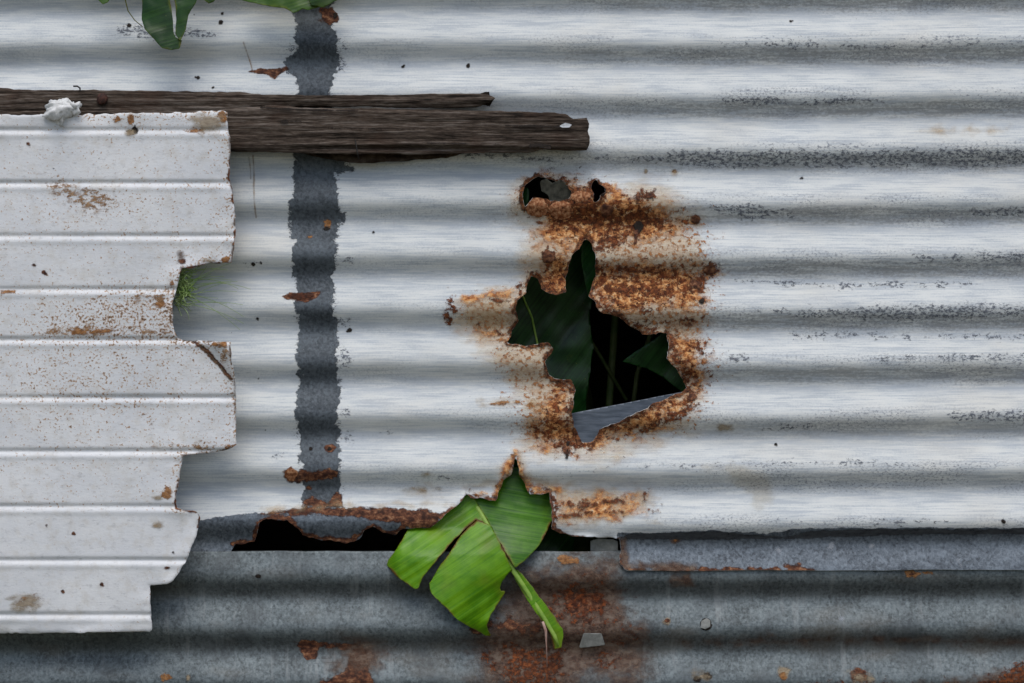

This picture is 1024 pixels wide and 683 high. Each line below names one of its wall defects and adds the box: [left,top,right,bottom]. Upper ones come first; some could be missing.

rust [248,56,289,79]
rust [47,180,115,216]
rust [42,325,170,336]
rust [230,163,733,547]
rust [470,538,815,683]